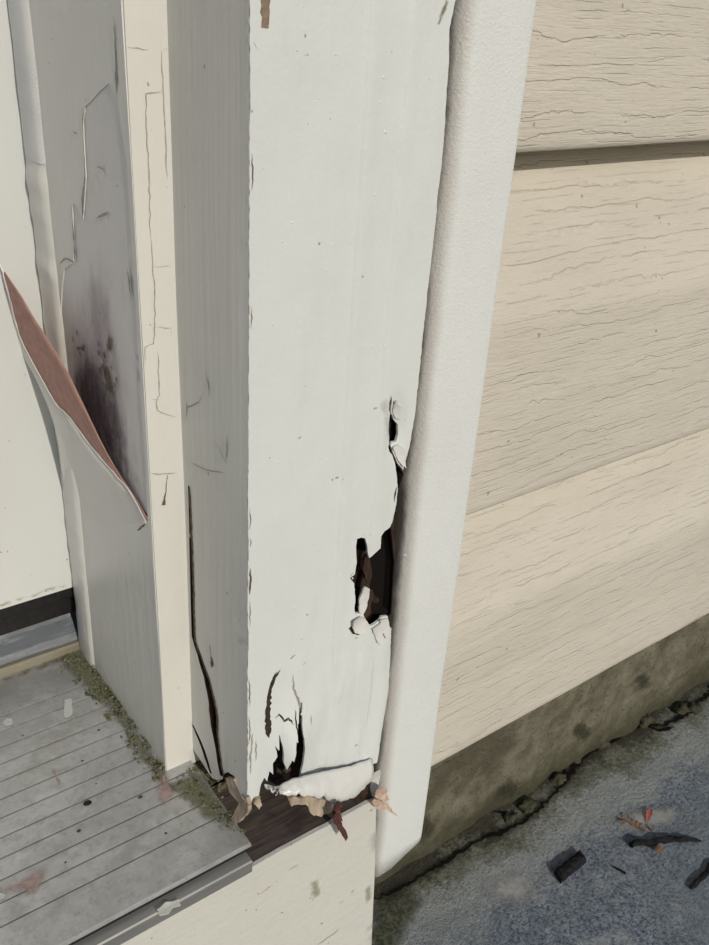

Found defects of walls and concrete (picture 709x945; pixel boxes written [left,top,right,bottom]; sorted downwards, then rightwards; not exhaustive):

crack [60,110,109,263]
crack [113,17,209,417]
peeling [0,264,148,530]
mould [72,317,127,471]
spalling [388,419,407,488]
crack [151,441,227,780]
spalling [352,526,395,645]
crack [250,662,312,774]
peeling [264,758,381,817]
crack [374,690,709,900]